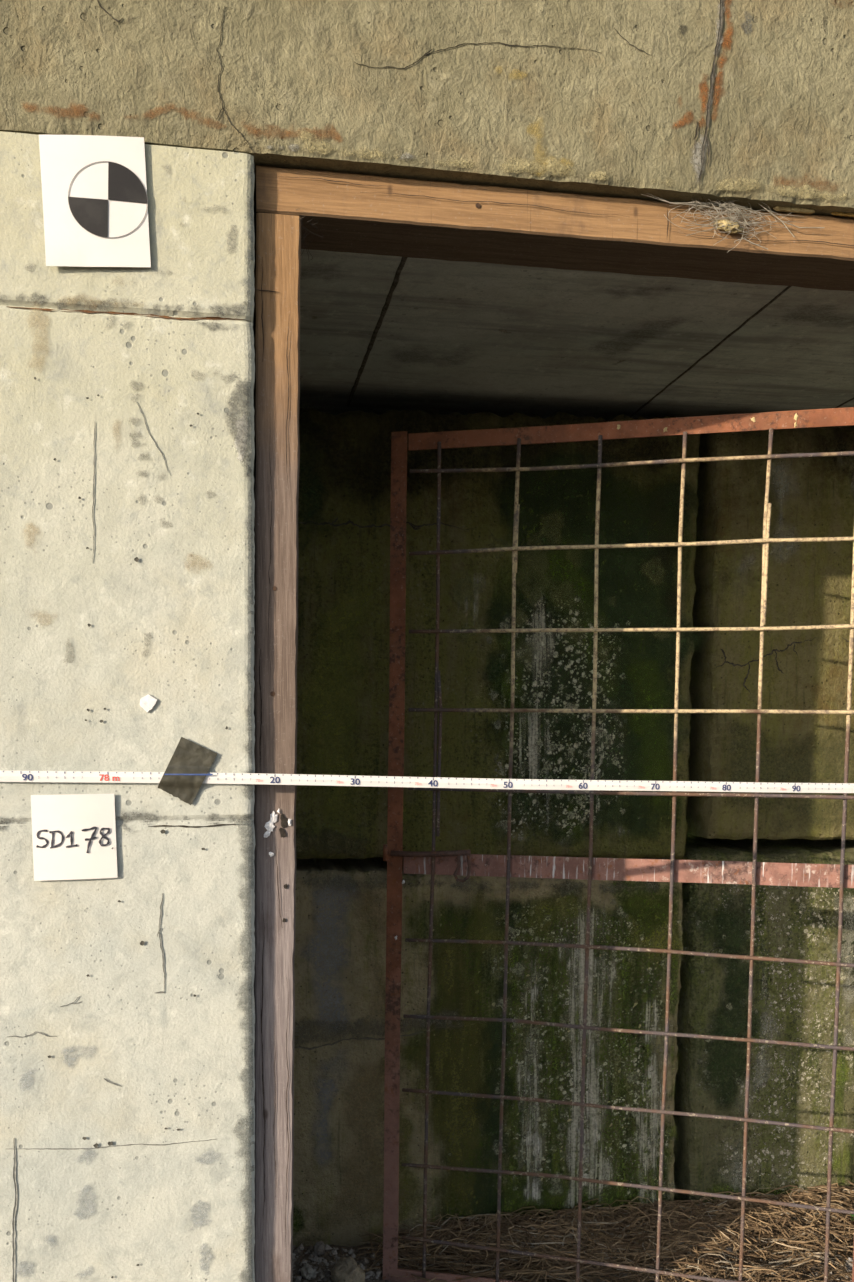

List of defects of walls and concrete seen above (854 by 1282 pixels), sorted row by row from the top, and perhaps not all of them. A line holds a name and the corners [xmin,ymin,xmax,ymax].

crack [216,6,254,153]
crack [355,28,649,69]
corrosion [674,0,733,127]
crack [693,0,724,187]
damp [519,604,554,779]
crack [712,637,849,694]
damp [518,1057,542,1200]
damp [559,908,616,1209]
damp [636,1000,663,1206]